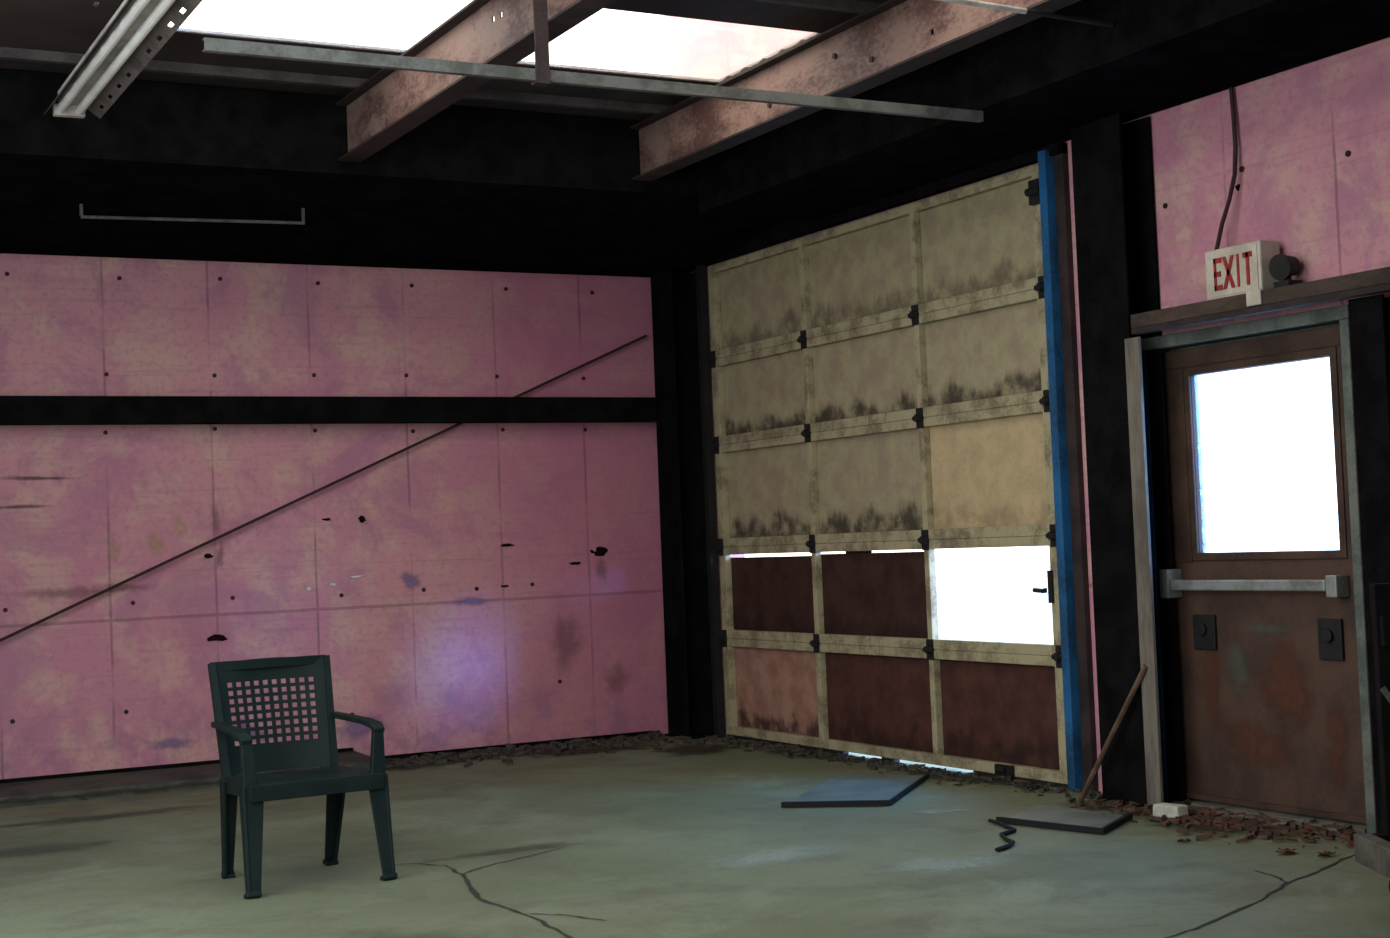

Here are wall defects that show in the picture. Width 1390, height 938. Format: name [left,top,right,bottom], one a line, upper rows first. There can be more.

crack [395,847,606,938]